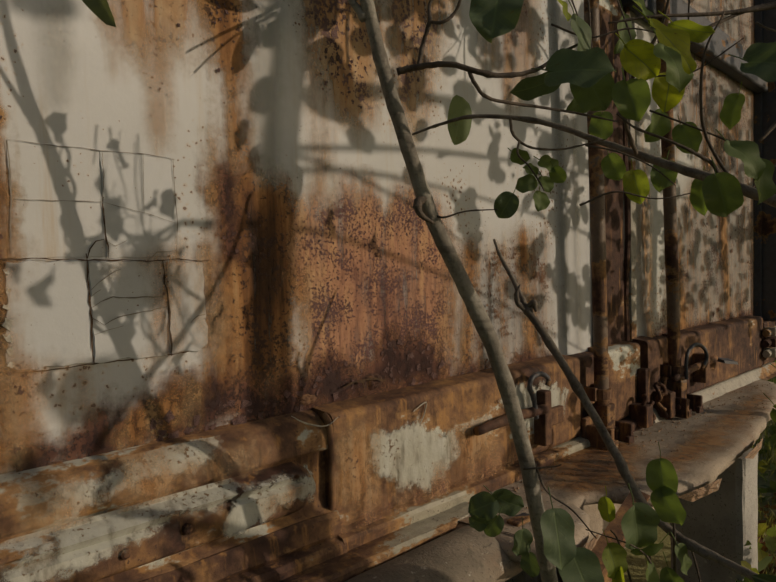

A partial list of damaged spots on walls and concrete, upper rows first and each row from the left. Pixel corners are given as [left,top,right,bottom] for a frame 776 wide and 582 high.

corrosion [113,0,202,65]
corrosion [378,0,455,127]
corrosion [677,55,755,184]
crack [0,139,213,373]
corrosion [0,162,491,472]
corrosion [461,220,555,365]
corrosion [641,194,667,337]
corrosion [678,199,755,330]
peeling [5,436,316,582]
corrosion [341,430,416,524]
peeling [370,402,460,491]
corrosion [463,419,499,481]